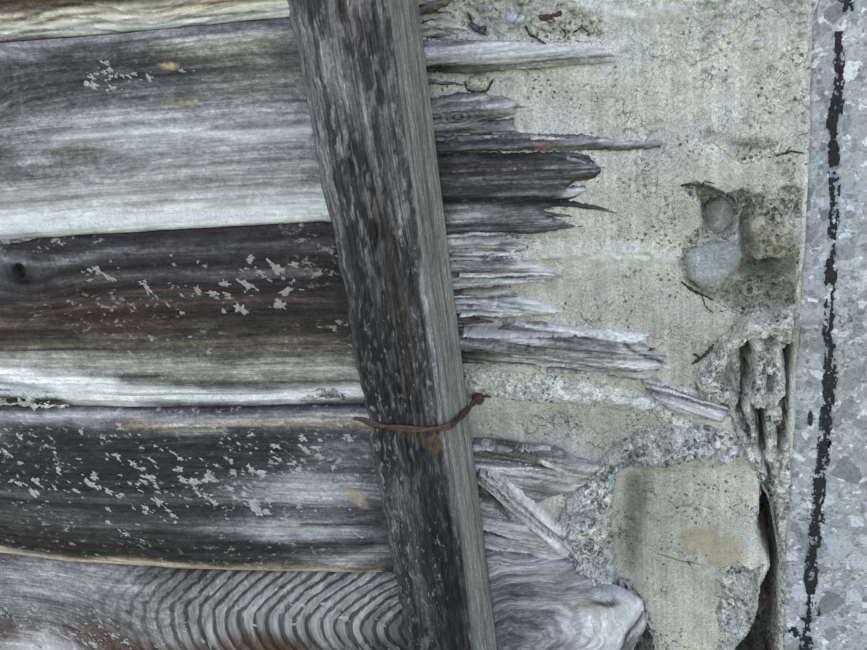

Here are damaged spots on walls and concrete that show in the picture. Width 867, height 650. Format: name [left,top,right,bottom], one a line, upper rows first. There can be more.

spalling [557,180,805,650]